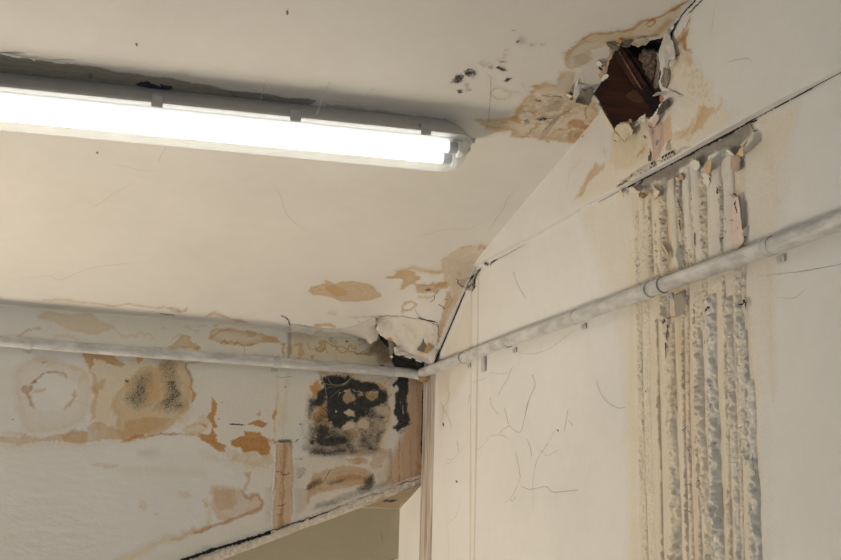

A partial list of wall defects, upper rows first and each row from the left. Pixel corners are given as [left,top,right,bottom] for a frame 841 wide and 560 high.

flaking render [566,78,594,106]
flaking render [596,30,750,200]
water stain [0,279,421,560]
flaking render [270,438,299,531]
crack [181,390,423,560]
water stain [383,242,488,560]